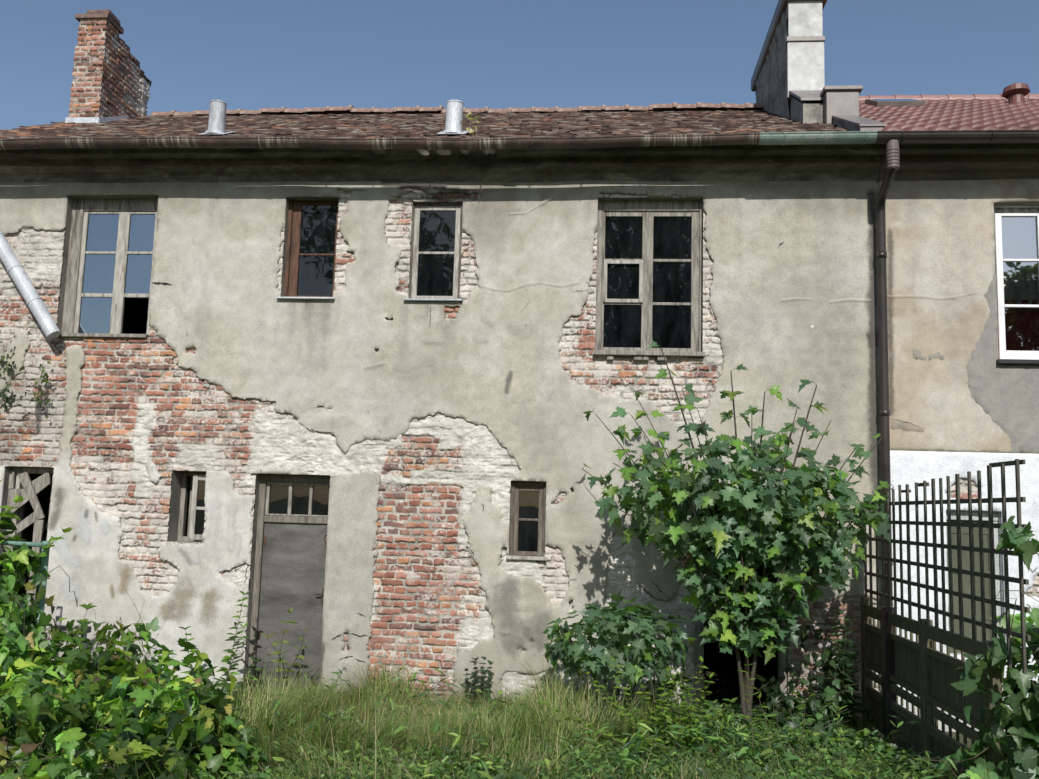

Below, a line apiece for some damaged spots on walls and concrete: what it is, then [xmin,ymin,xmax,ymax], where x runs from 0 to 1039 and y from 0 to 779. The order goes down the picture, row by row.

flaking render [5,227,65,323]
flaking render [277,227,285,293]
flaking render [334,189,355,291]
flaking render [384,187,481,295]
flaking render [445,230,479,320]
flaking render [558,197,724,425]
water stain [868,191,894,512]
flaking render [0,259,521,703]
flaking render [551,487,574,505]
flaking render [1024,573,1039,598]